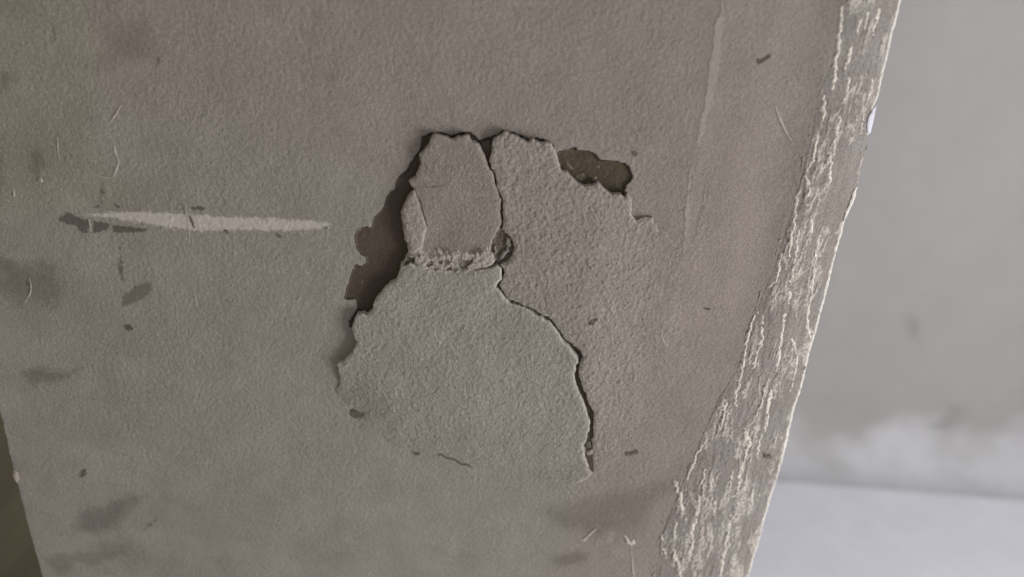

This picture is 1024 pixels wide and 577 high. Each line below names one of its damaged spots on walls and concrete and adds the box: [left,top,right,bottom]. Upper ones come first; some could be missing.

crack [482,140,503,225]
peeling [335,130,682,483]
crack [497,263,594,472]
spalling [653,0,901,577]